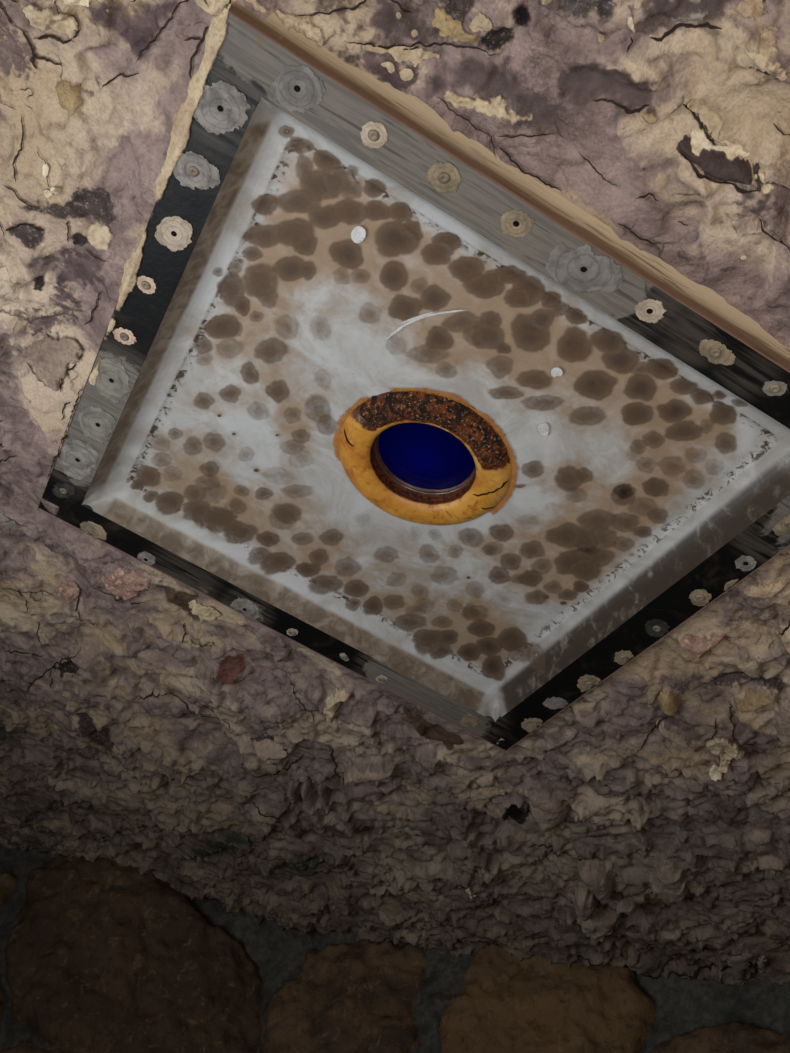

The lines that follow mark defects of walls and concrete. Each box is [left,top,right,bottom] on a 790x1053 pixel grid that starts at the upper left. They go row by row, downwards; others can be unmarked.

crack [102,0,231,88]
peeling [362,29,440,81]
flaking render [432,0,530,51]
crack [627,22,722,52]
crack [0,0,106,262]
crack [683,104,716,146]
peeling [687,98,773,194]
damp [737,184,783,227]
damp [195,126,746,453]
corrosion [333,388,518,514]
damp [130,431,542,680]
damp [462,463,677,605]